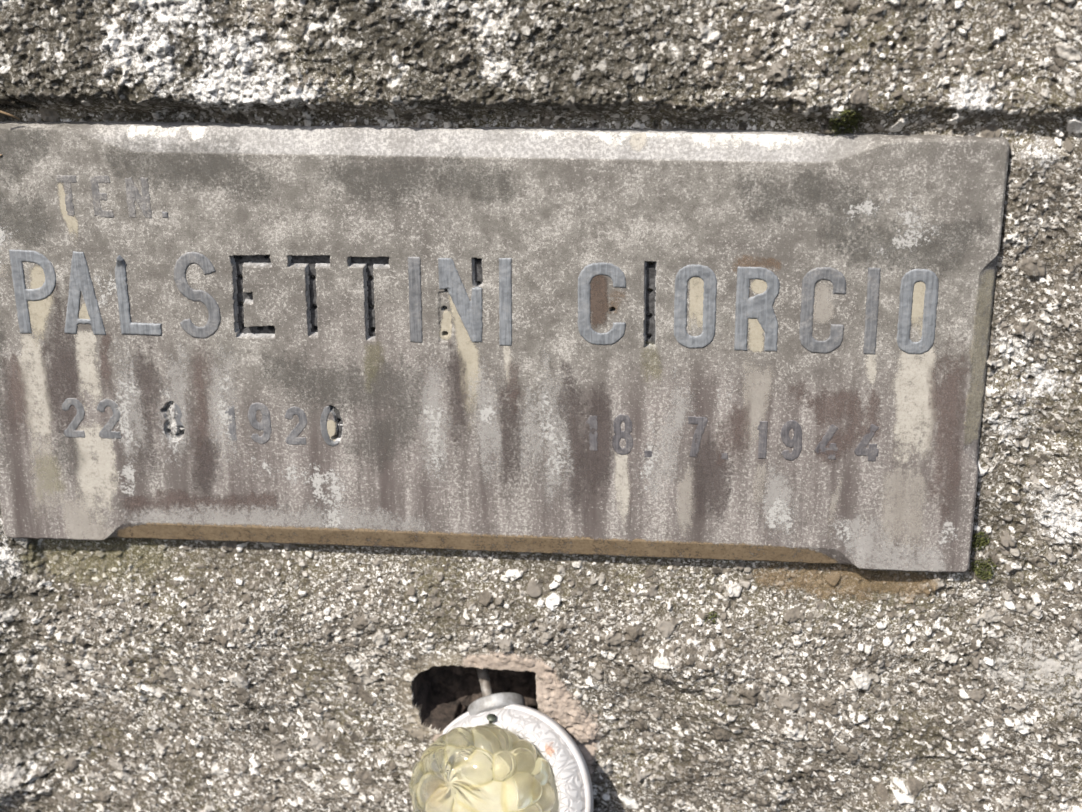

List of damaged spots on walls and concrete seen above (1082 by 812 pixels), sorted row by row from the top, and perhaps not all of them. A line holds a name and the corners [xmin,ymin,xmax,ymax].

leakage [9,266,162,541]
leakage [126,354,277,520]
leakage [327,420,338,441]
leakage [439,296,481,446]
leakage [497,345,522,482]
leakage [554,365,630,518]
leakage [677,367,771,528]
leakage [748,318,764,352]
leakage [790,352,879,463]
leakage [911,281,926,335]
leakage [883,347,969,546]
spalling [411,665,538,732]